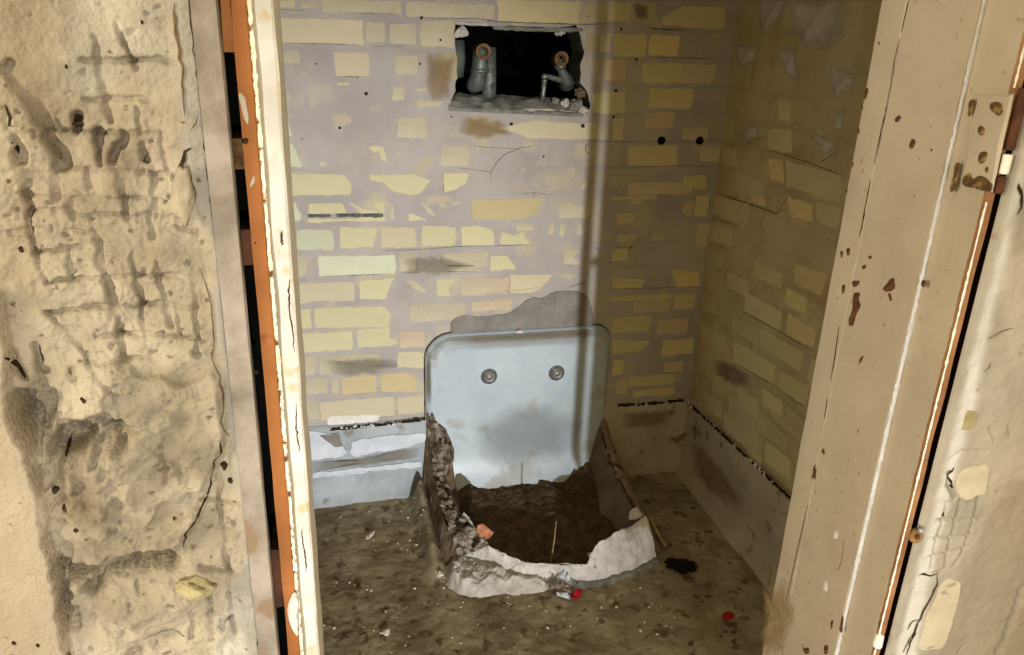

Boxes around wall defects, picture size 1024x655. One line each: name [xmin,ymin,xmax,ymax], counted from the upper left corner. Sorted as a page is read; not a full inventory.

water stain [431,62,450,94]
water stain [468,122,501,136]
corrosion [989,102,1003,116]
corrosion [962,151,992,192]
peeling [246,0,843,655]
crack [183,269,230,547]
peeling [879,202,988,634]
crack [903,573,938,653]